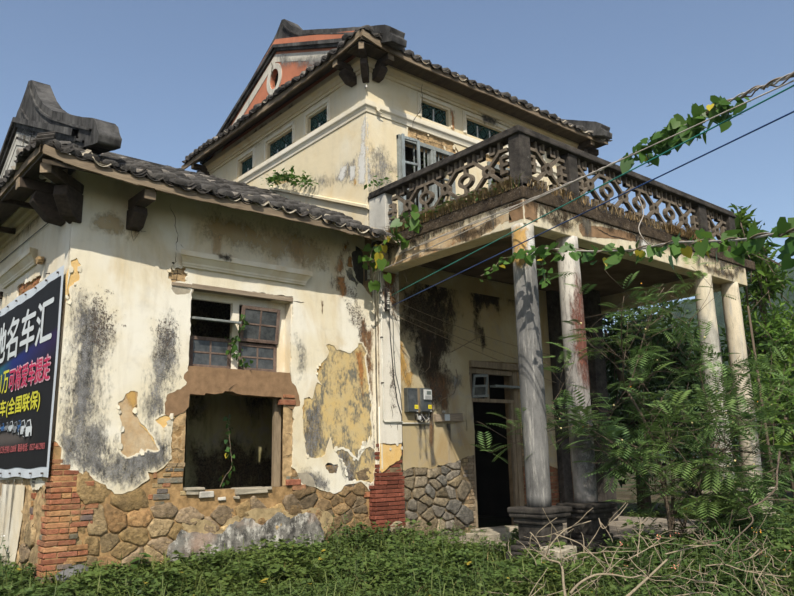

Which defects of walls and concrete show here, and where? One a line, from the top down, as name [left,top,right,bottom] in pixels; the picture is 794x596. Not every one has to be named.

peeling [338,116,371,184]
spalling [19,276,41,296]
peeling [65,258,82,305]
water stain [60,289,167,485]
water stain [143,318,180,418]
spalling [167,265,192,288]
water stain [331,278,379,448]
peeling [383,199,538,270]
water stain [374,200,670,387]
corrosion [571,277,590,387]
water stain [694,252,744,279]
spalling [0,343,476,584]